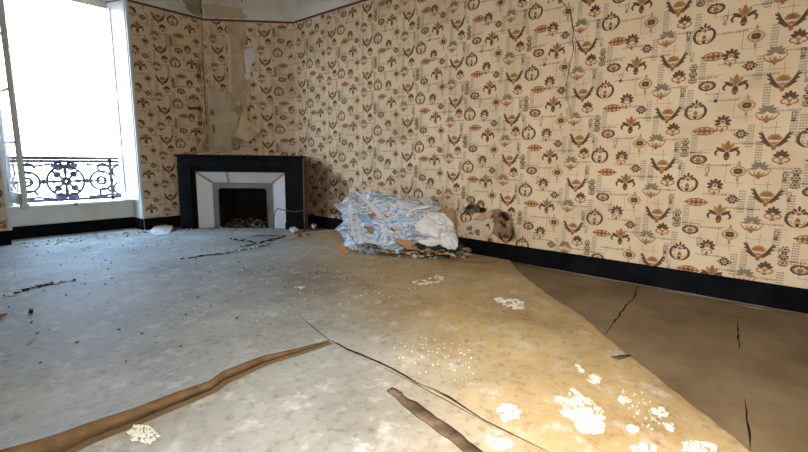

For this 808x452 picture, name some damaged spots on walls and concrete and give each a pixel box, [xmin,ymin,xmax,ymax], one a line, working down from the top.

peeling [177,0,249,19]
crack [606,285,639,333]
crack [743,399,751,448]